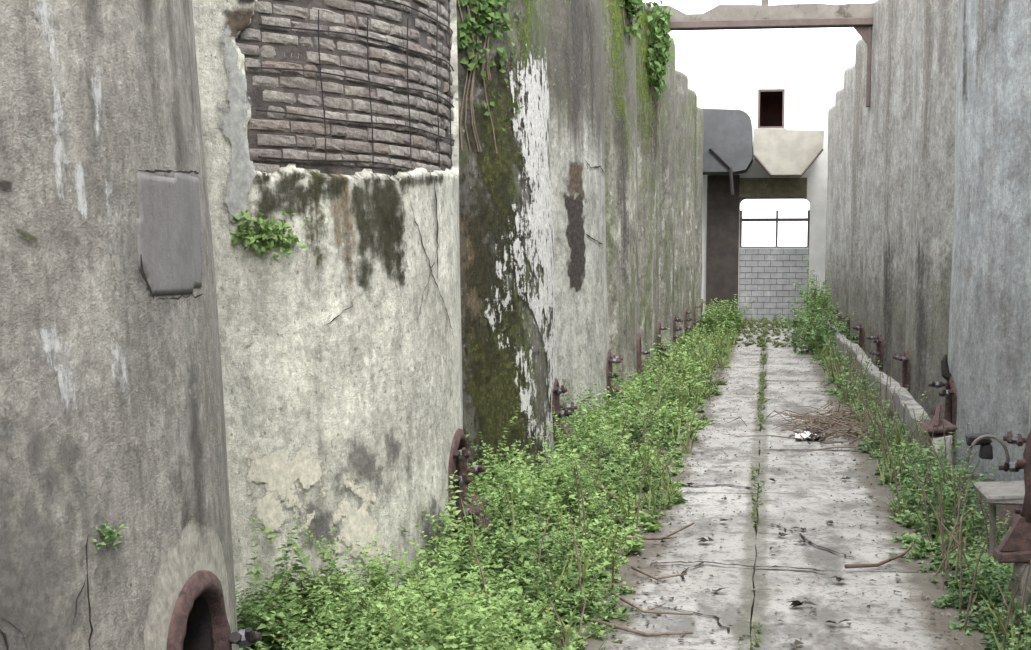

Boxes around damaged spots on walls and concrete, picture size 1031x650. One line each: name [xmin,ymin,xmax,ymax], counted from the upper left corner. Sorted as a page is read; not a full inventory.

spalling [218,0,455,223]
leakage [254,171,443,289]
peeling [484,44,587,466]
crack [0,618,27,650]
crack [73,534,93,650]